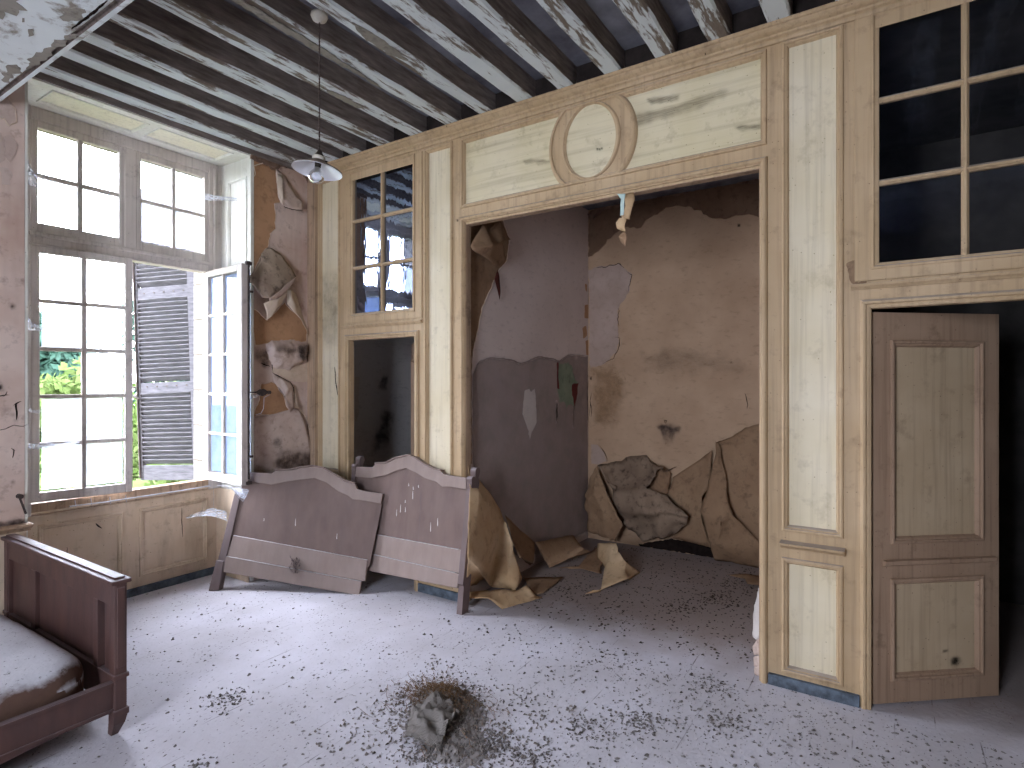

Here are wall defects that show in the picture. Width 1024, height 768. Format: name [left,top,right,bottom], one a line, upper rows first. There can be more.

peeling [0,0,34,37]
peeling [1,7,86,83]
peeling [233,0,382,89]
peeling [0,97,18,185]
peeling [250,154,308,346]
peeling [471,221,510,269]
peeling [587,179,759,257]
peeling [254,374,298,417]